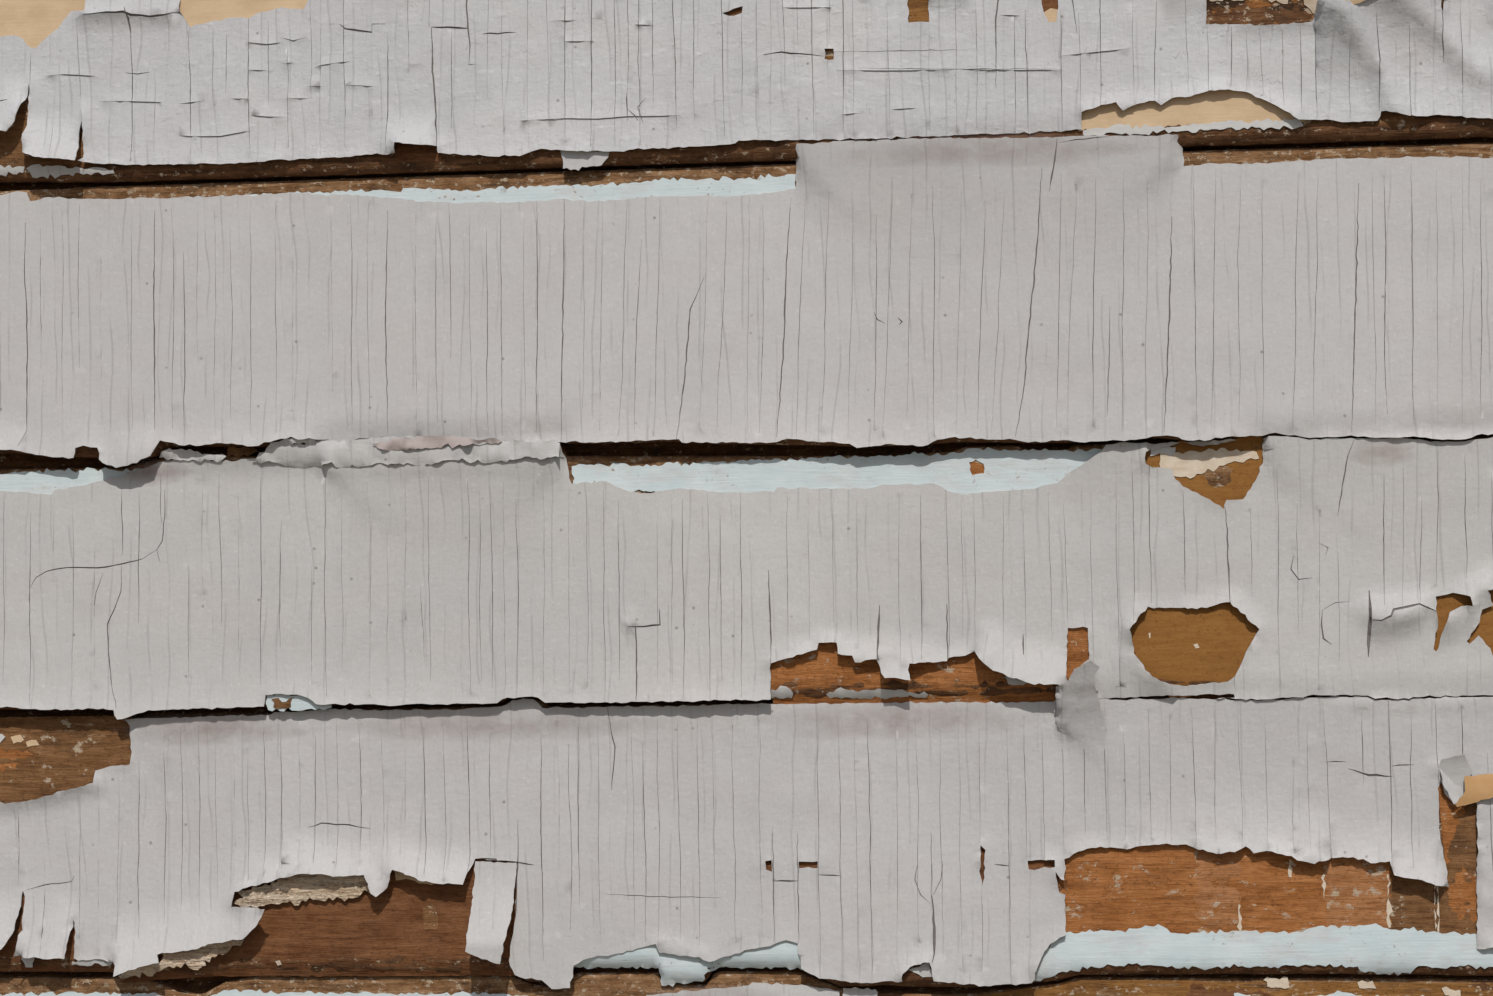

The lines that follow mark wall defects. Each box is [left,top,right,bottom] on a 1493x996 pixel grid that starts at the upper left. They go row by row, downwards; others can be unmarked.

crack [91,10,171,150]
crack [181,6,389,137]
peeling [1078,90,1305,136]
crack [351,0,1463,439]
peeling [572,447,1102,495]
crack [1224,184,1493,670]
crack [30,502,165,702]
peeling [770,627,1106,750]
crack [424,466,1488,962]
peeling [1130,602,1259,699]
peeling [0,859,527,996]
peeling [982,754,1493,996]